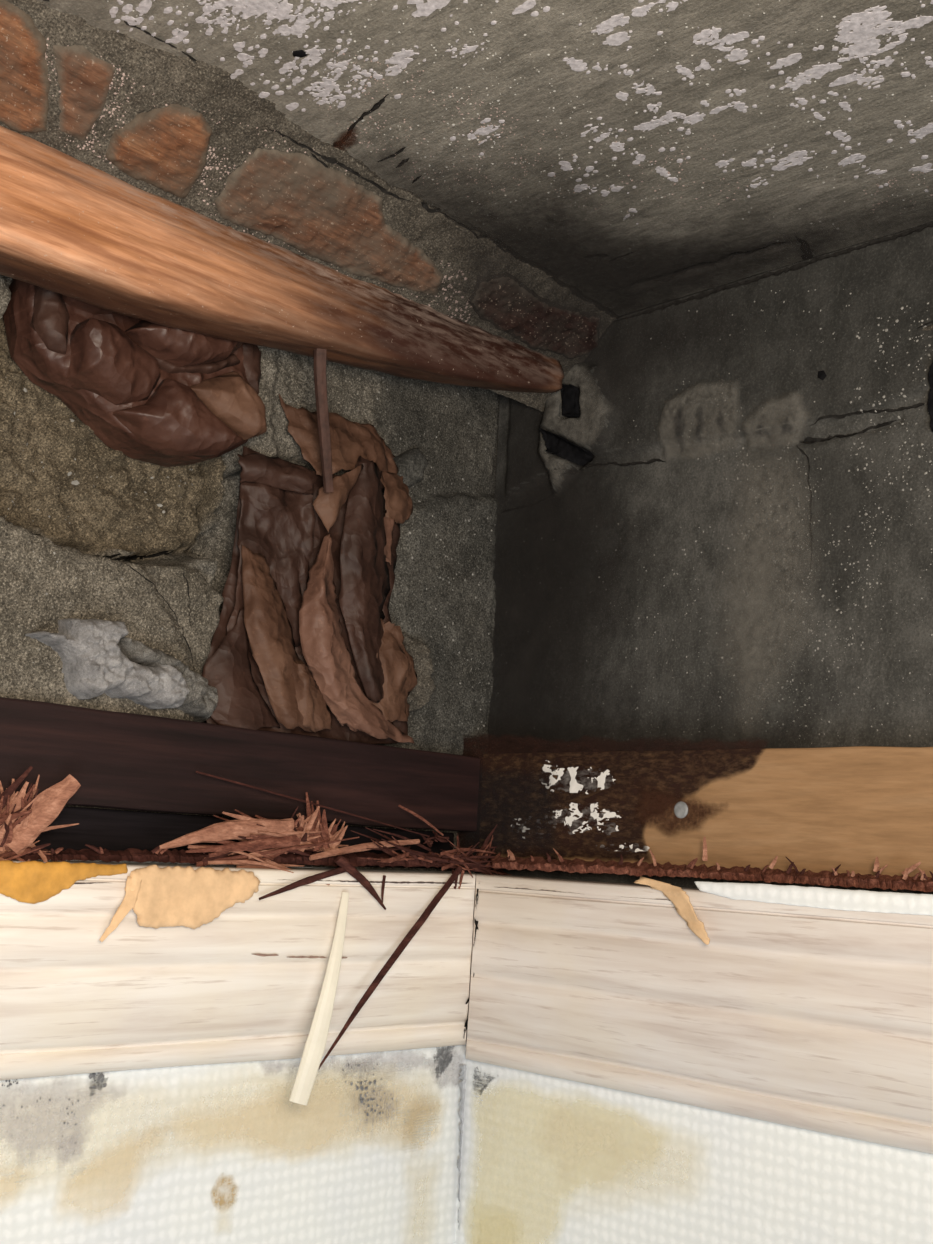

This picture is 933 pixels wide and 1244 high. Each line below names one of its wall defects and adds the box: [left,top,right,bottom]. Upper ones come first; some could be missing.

crack [268,94,508,253]
spalling [561,383,581,418]
spalling [539,428,595,467]
crack [501,459,665,513]
crack [797,403,925,570]
water stain [58,1072,107,1154]
water stain [342,1062,393,1116]
water stain [434,1046,452,1078]